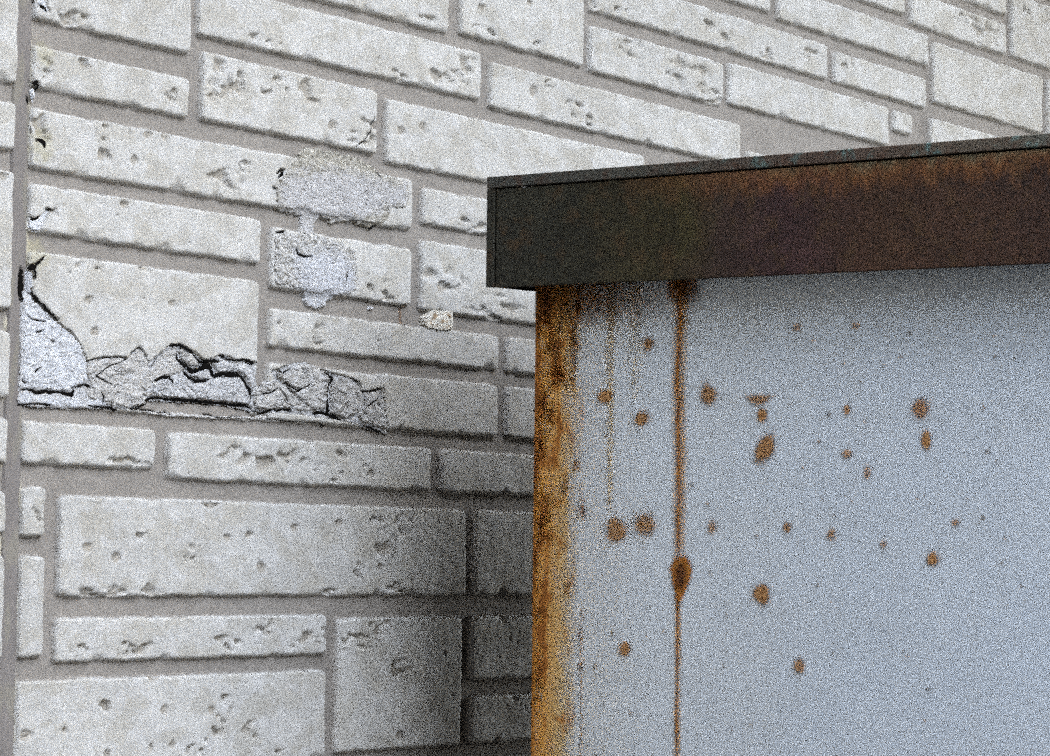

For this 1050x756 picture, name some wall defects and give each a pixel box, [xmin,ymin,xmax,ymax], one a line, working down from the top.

spalling [17,271,388,434]
peeling [274,147,410,311]
corrosion [531,283,612,756]
corrosion [662,279,696,756]